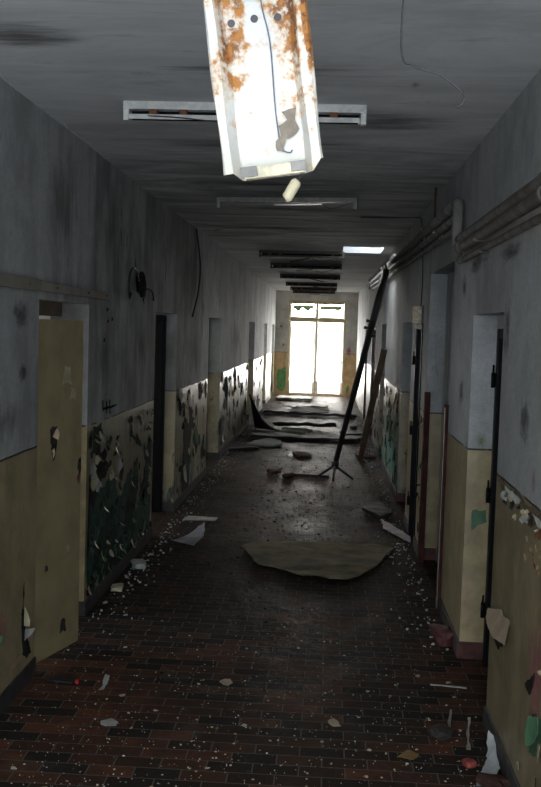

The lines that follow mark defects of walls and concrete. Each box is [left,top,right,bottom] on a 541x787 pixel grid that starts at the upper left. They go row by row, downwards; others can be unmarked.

peeling [177,382,207,493]
peeling [218,358,263,445]
peeling [371,383,399,487]
peeling [77,409,154,597]
peeling [498,478,541,540]